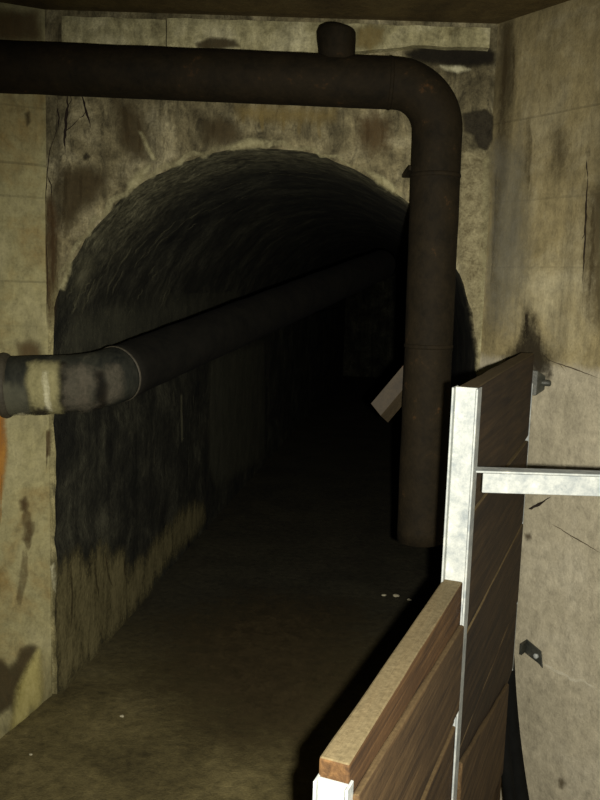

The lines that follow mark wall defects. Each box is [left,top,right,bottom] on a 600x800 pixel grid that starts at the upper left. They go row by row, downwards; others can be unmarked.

leakage [197,38,238,49]
crack [45,96,91,203]
crack [581,161,589,281]